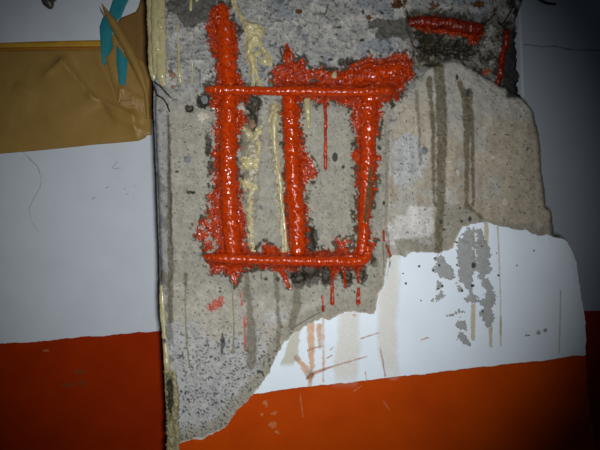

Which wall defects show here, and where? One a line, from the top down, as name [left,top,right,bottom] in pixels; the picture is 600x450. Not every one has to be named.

spalling [153,0,556,318]
leakage [426,63,488,253]
leakage [243,276,256,368]
leakage [274,271,300,363]
corrosion [295,323,367,385]